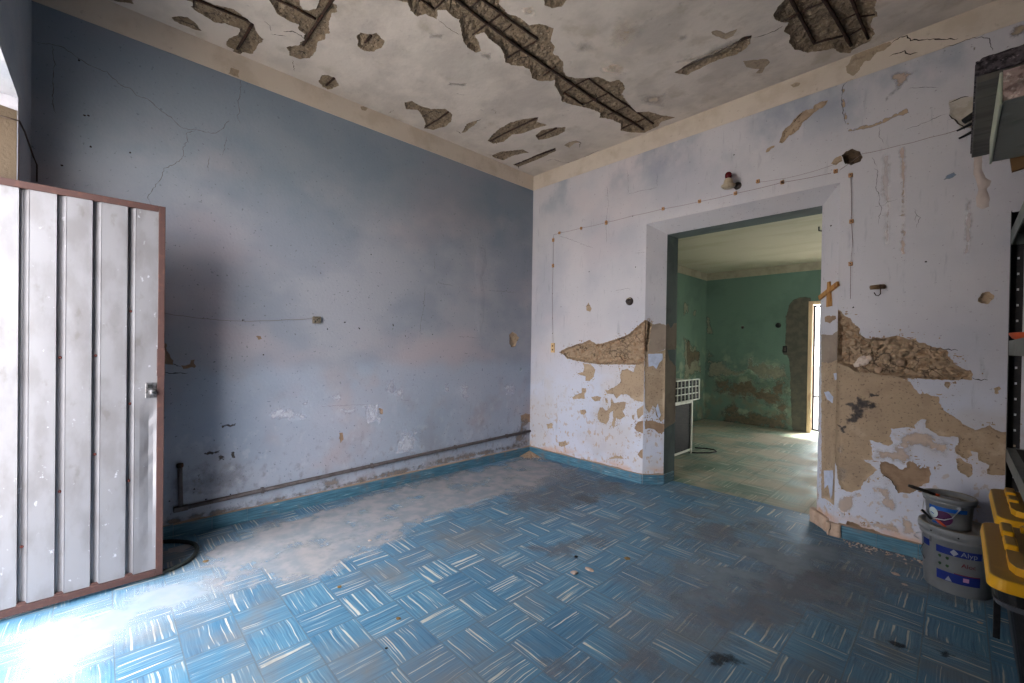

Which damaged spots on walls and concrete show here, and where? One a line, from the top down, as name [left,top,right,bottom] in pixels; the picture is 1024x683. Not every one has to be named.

spalling [172,0,264,54]
spalling [269,0,337,59]
spalling [398,0,675,133]
spalling [674,29,770,75]
spalling [773,0,956,76]
flaking render [766,100,828,152]
flaking render [559,318,677,466]
flaking render [818,307,1016,533]